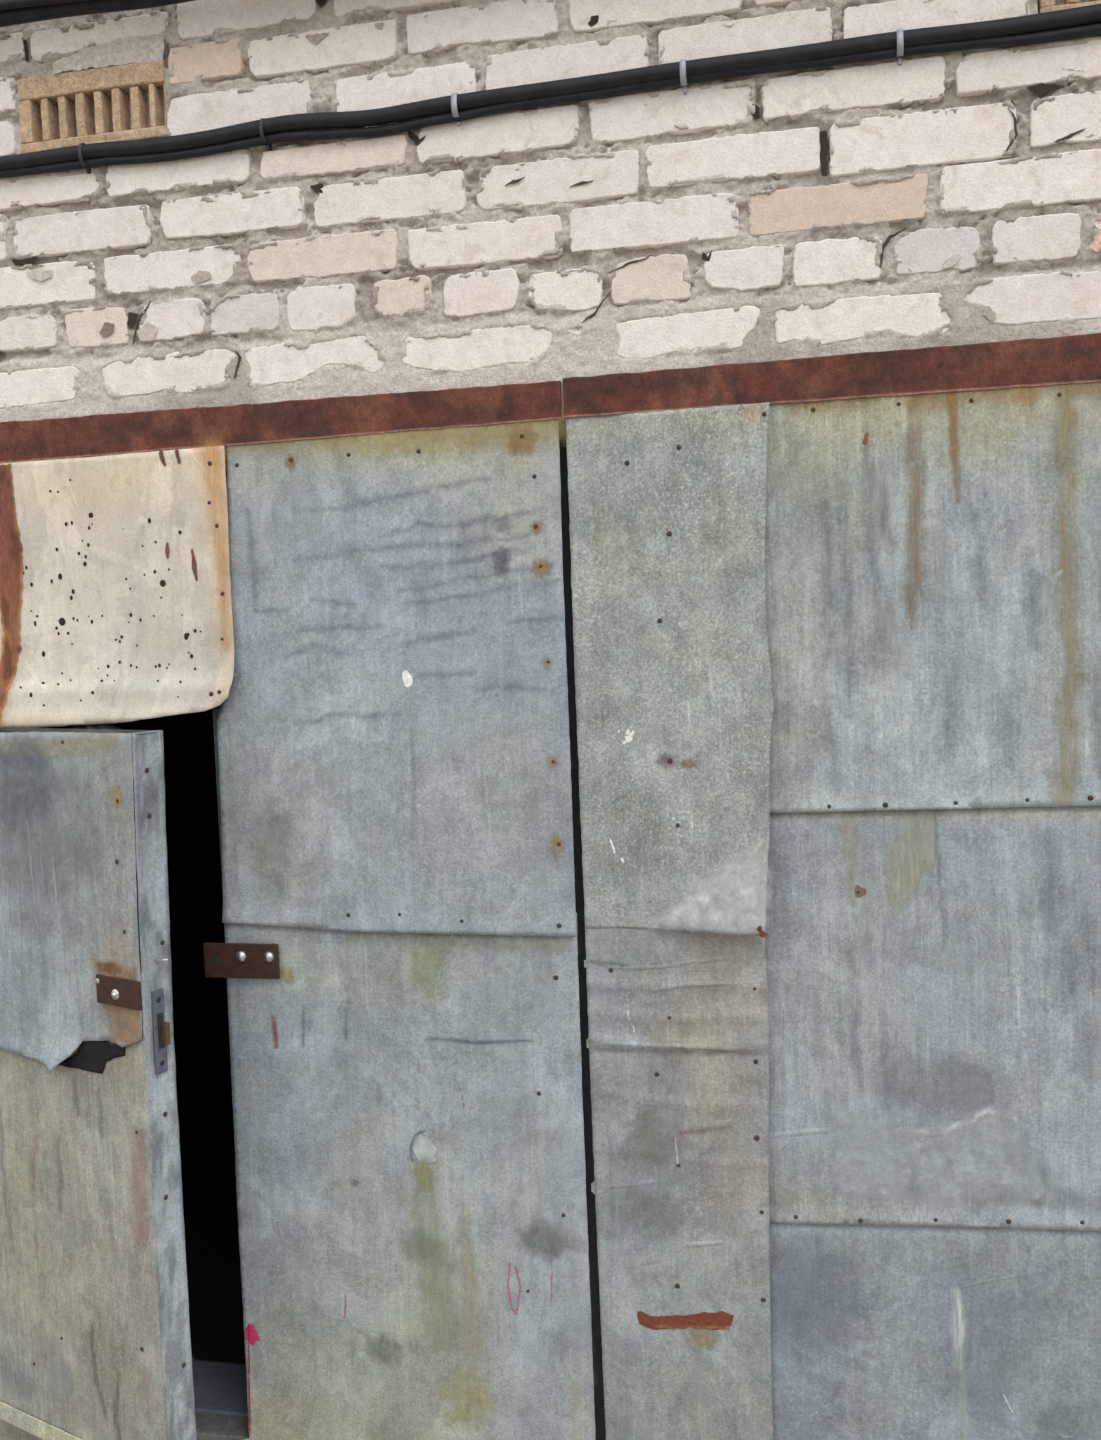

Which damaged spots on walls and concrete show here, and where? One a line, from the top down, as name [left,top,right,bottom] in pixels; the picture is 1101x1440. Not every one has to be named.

corrosion [159,450,181,466]
corrosion [314,412,564,452]
corrosion [949,392,957,465]
corrosion [907,464,920,611]
corrosion [0,463,23,718]
corrosion [637,1311,734,1330]
damp [953,1290,965,1363]